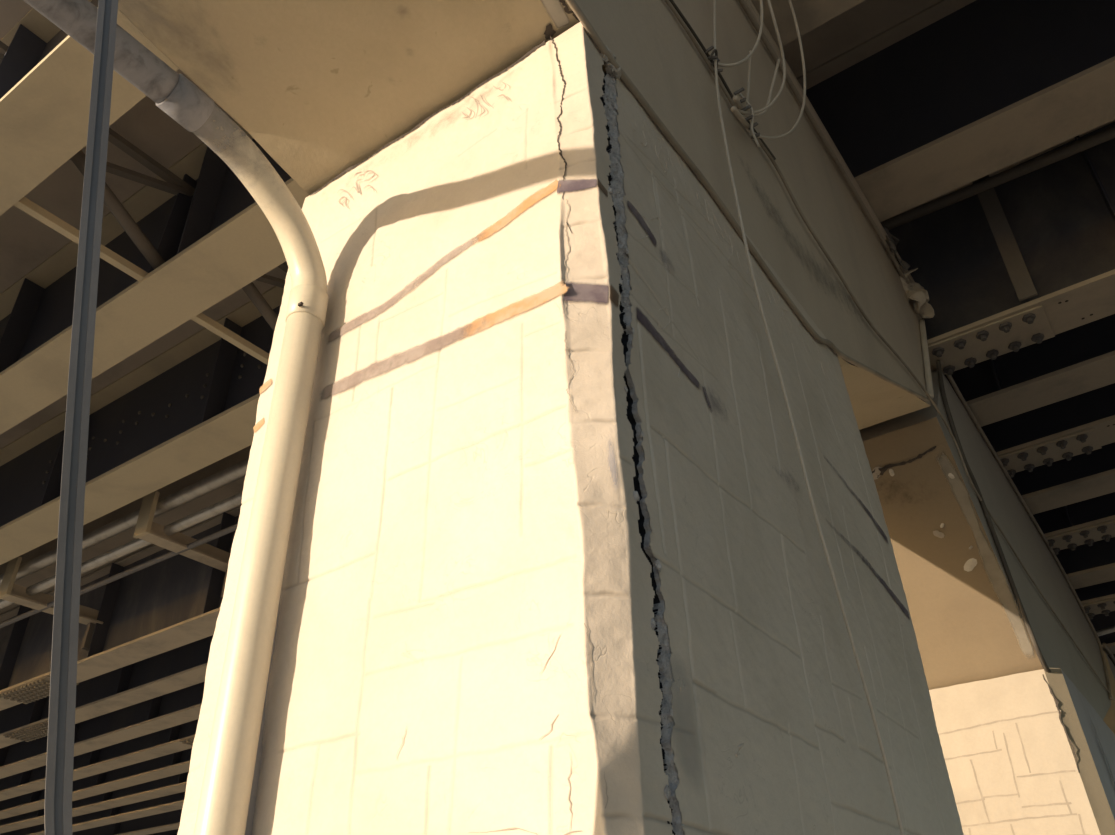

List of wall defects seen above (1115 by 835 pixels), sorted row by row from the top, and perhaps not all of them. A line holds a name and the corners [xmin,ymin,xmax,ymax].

crack [310,0,580,412]
crack [600,46,685,835]
crack [872,446,936,478]